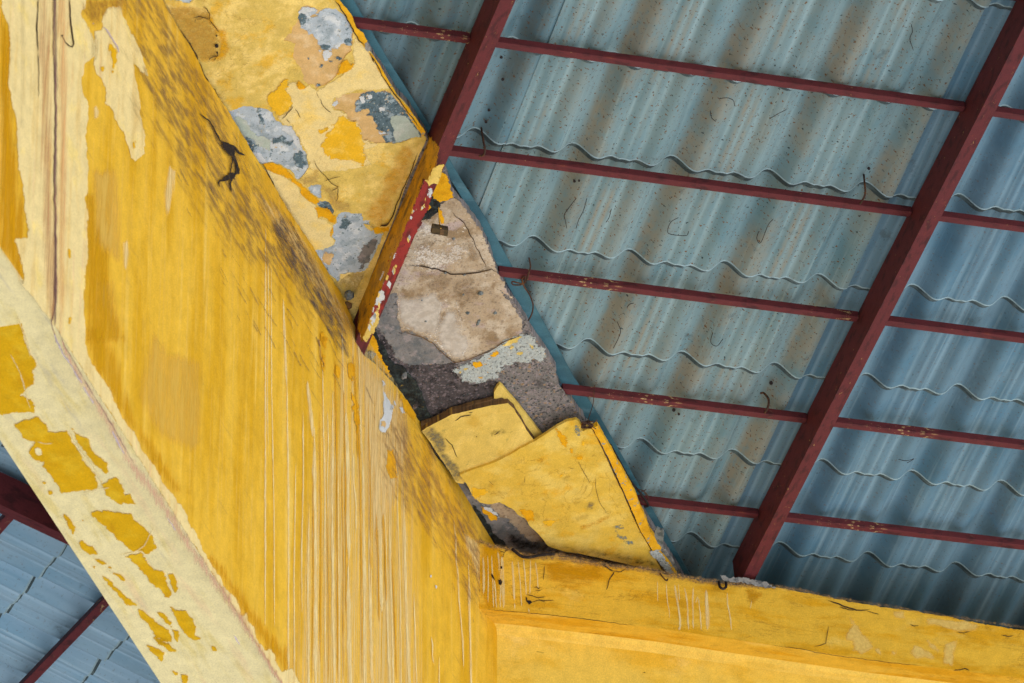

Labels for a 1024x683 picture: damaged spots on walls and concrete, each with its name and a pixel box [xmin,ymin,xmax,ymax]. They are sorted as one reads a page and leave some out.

peeling [0,0,300,683]
crack [179,7,282,199]
water stain [44,0,417,683]
spalling [163,0,585,531]
mould [428,428,459,477]